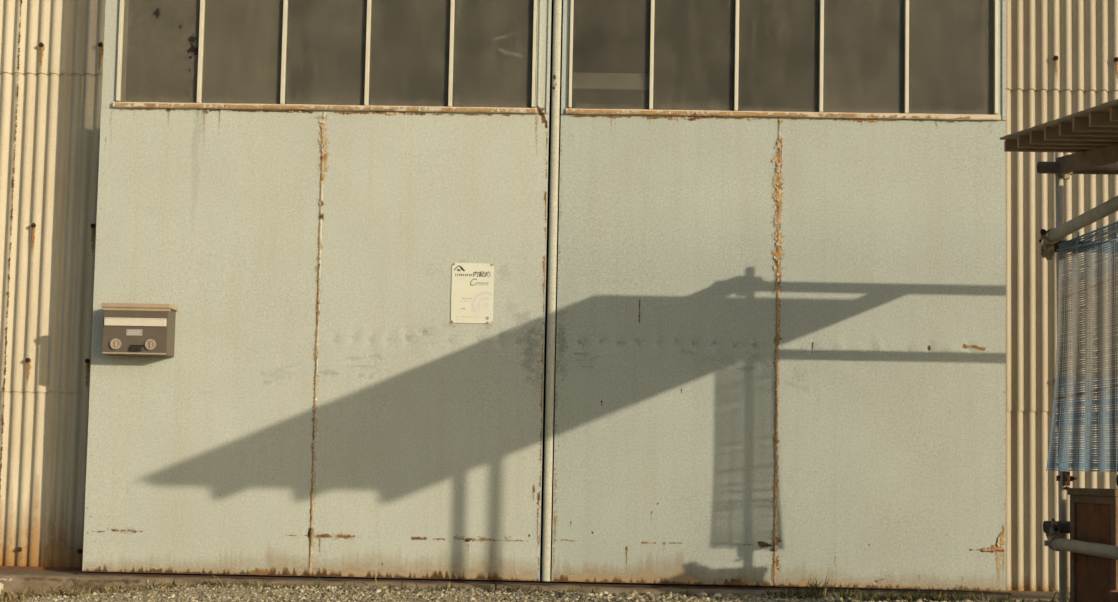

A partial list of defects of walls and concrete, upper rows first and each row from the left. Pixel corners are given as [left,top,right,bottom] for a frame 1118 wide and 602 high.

rust [115,103,562,152]
rust [566,109,981,125]
rust [0,0,22,489]
rust [411,305,1070,592]
rust [0,504,539,581]